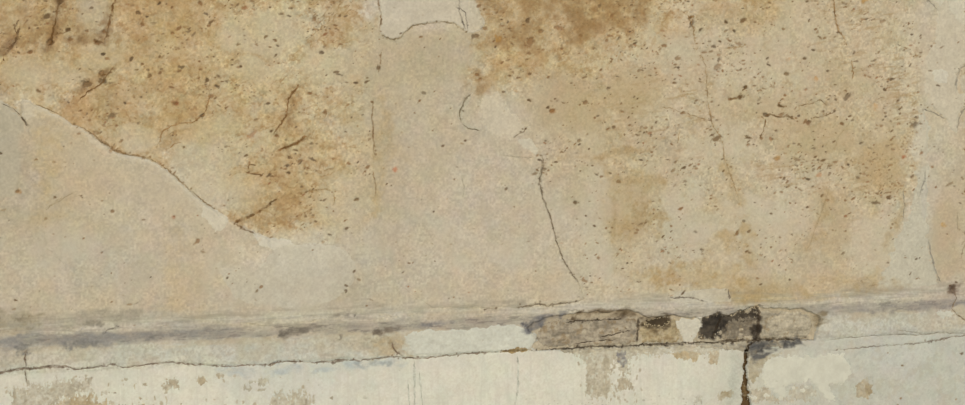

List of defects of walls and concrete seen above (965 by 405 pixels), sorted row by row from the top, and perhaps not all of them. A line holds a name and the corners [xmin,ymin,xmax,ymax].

spalling [0,0,750,285]
peeling [883,0,965,289]
crack [0,130,965,405]
peeling [8,374,126,405]
peeling [124,377,180,405]
peeling [241,376,319,405]
spalling [405,288,874,404]